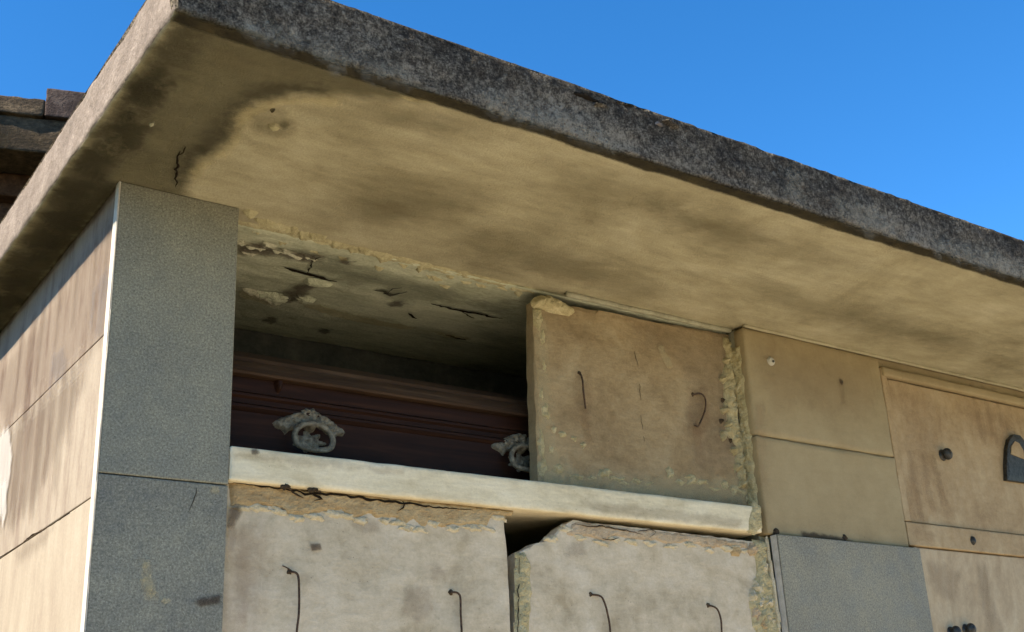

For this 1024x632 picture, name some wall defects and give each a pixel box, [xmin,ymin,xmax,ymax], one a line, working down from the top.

crack [174,147,186,187]
water stain [0,12,1024,332]
peeling [238,239,317,261]
peeling [241,277,334,324]
crack [375,288,503,340]
crack [233,482,471,511]
peeling [227,483,513,534]
peeling [543,522,782,632]